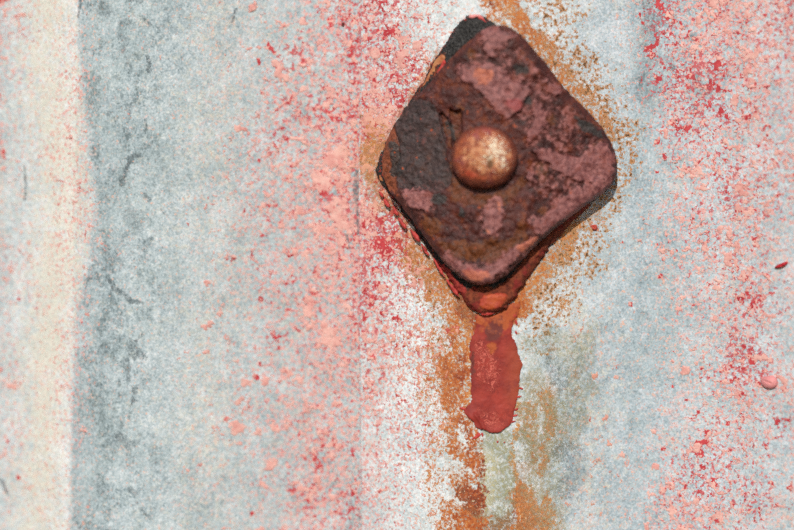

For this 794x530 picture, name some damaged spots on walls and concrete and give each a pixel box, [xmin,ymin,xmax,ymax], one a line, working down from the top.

peeling [50,169,110,276]
peeling [203,0,461,530]
rust [359,0,653,530]
peeling [558,414,612,506]
peeling [626,0,794,530]